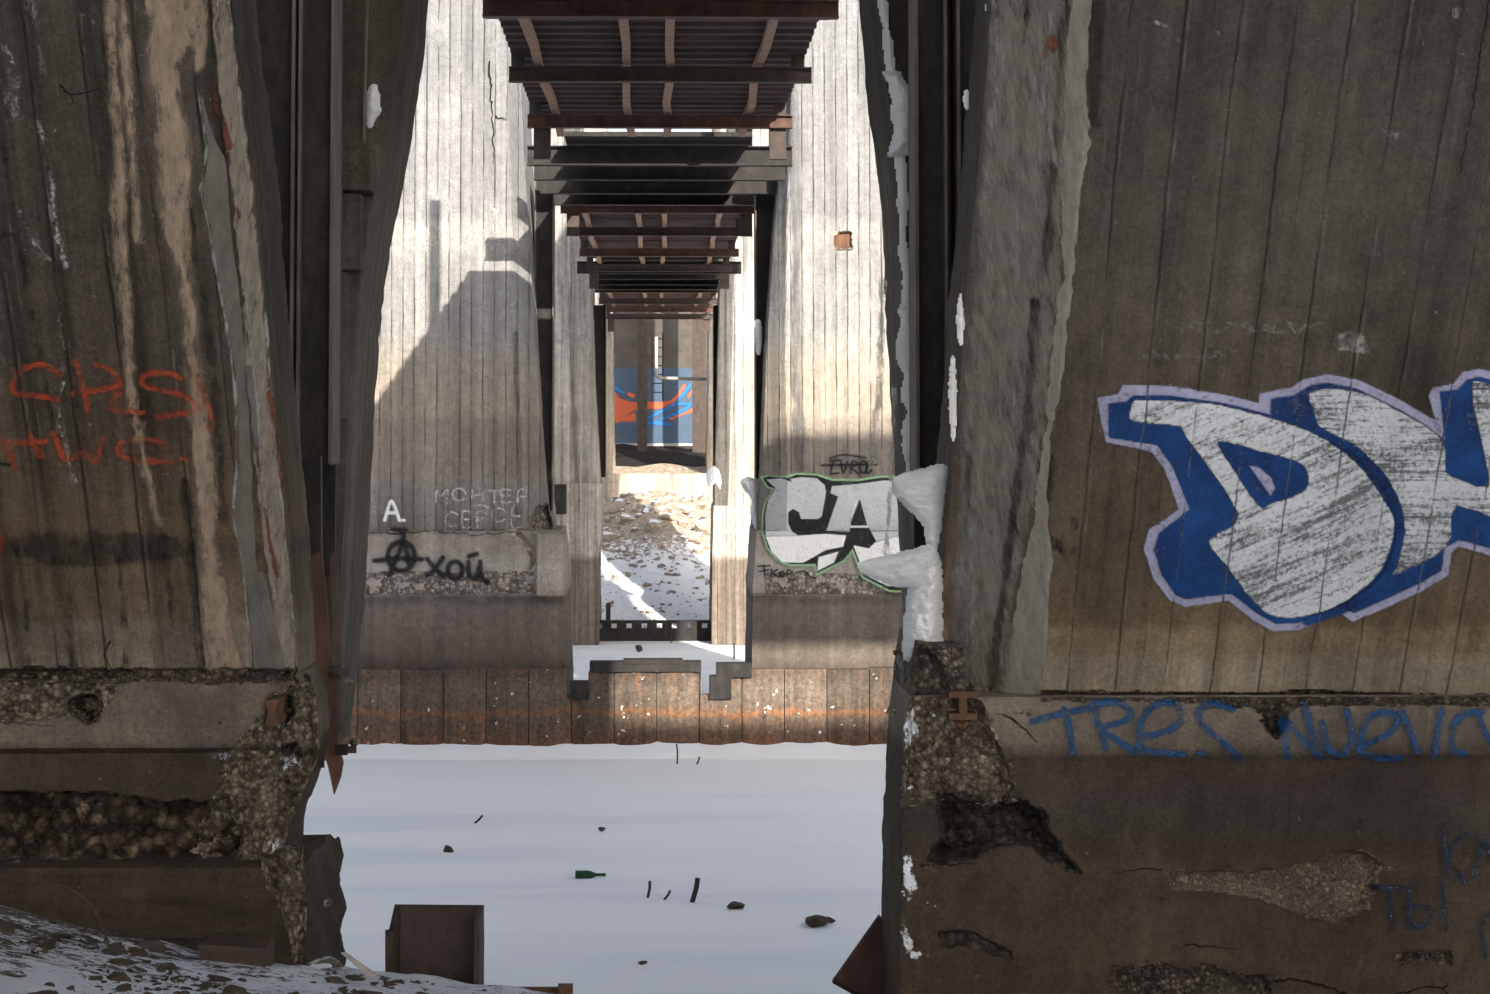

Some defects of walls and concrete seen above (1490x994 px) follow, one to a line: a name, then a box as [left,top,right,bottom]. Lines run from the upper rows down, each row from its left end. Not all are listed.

spalling [886,696,1084,875]
spalling [0,666,333,966]
spalling [1164,849,1393,923]
spalling [937,930,1014,962]
spalling [1106,959,1277,994]
crack [1272,977,1347,994]
crack [1395,984,1449,994]